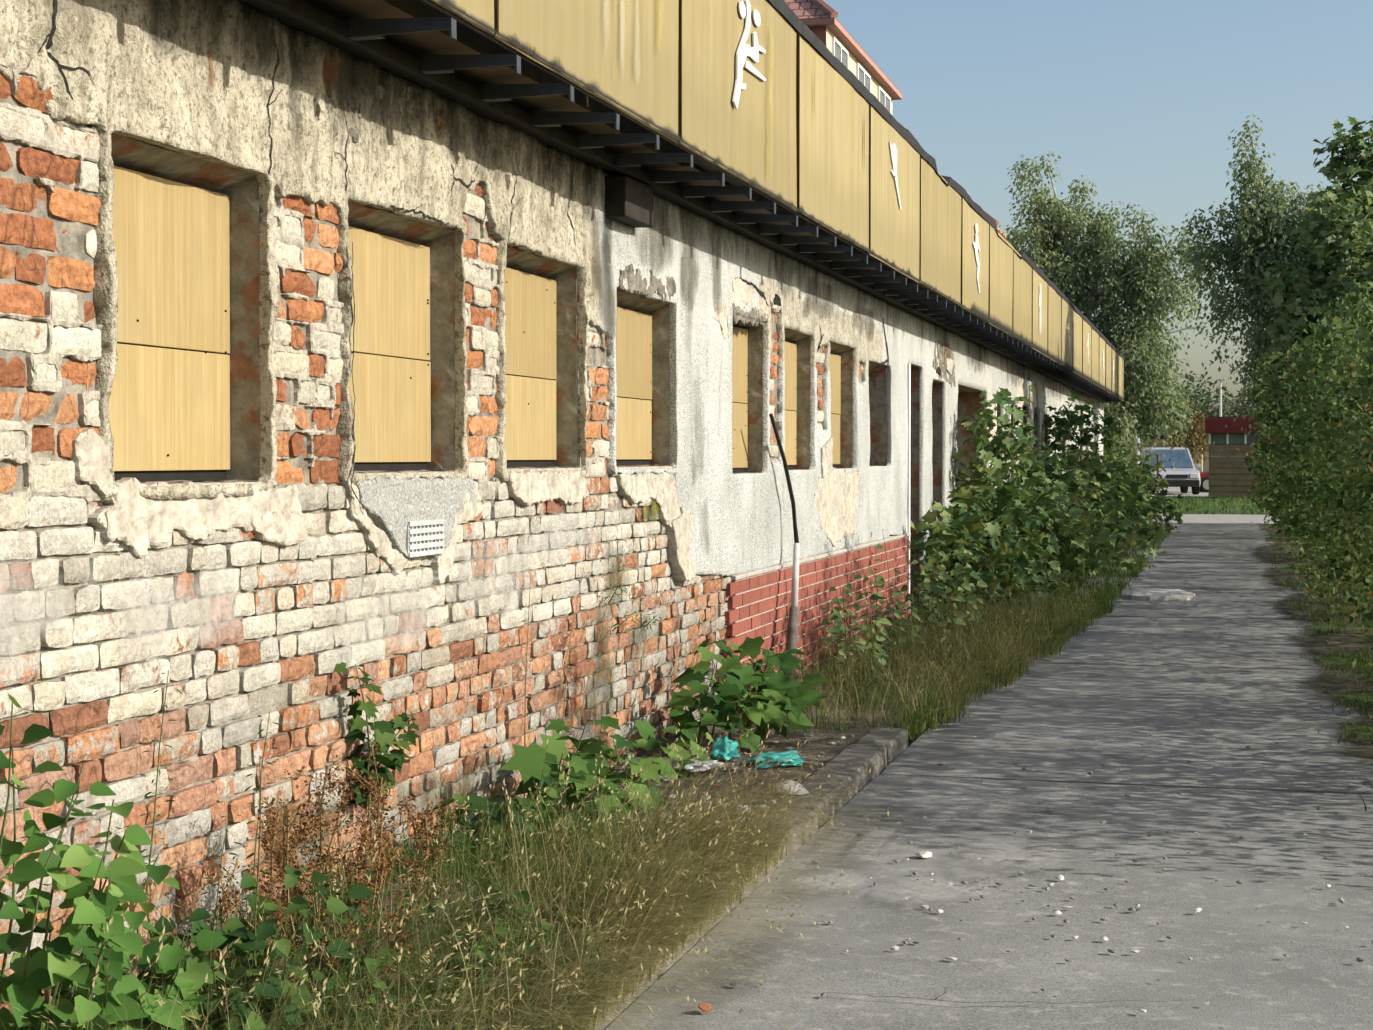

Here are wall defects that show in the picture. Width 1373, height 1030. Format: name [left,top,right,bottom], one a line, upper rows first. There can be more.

crack [39,0,95,100]
crack [267,26,283,175]
spalling [316,103,362,144]
spalling [617,264,676,304]
flaking render [69,429,309,558]
flaking render [338,475,483,584]
flaking render [506,470,589,506]
flaking render [613,471,696,581]
spalling [814,437,860,547]